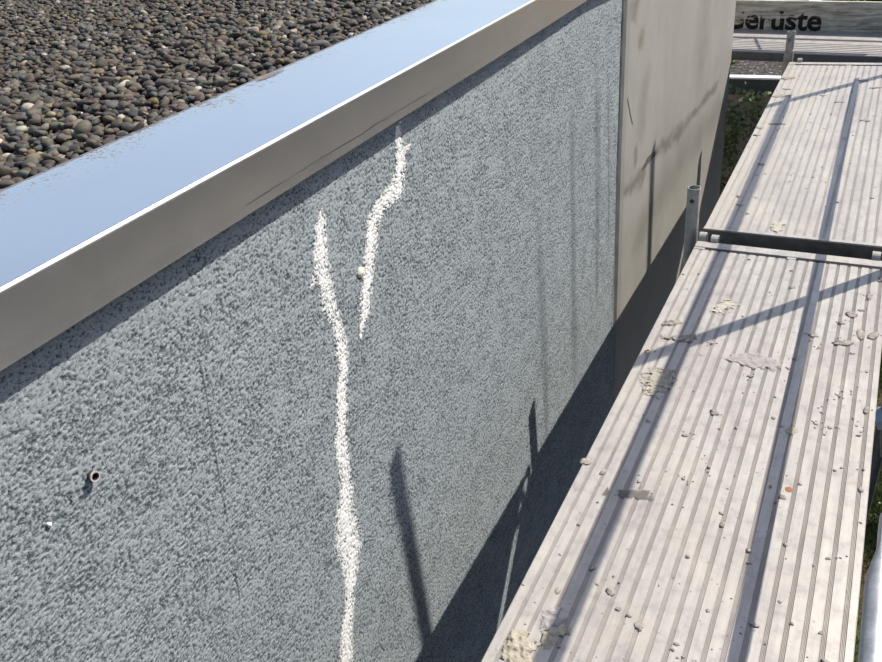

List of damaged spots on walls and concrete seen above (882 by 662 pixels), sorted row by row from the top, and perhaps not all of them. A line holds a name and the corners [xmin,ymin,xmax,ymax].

crack [309,121,411,662]